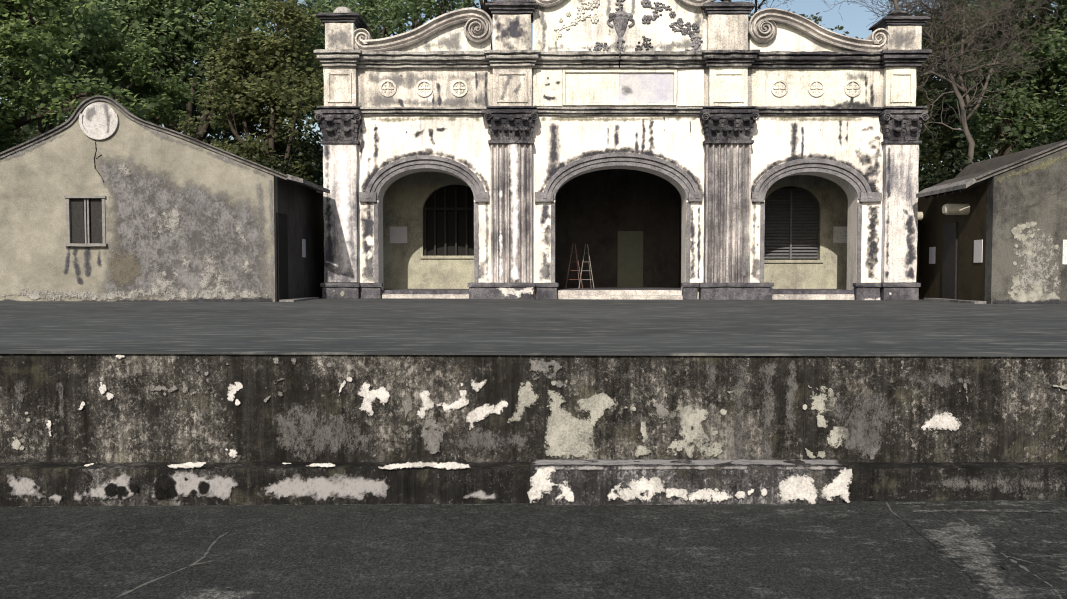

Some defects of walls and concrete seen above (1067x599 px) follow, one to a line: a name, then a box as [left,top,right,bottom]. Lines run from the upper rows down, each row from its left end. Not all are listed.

water stain [359,70,488,107]
water stain [360,120,489,281]
water stain [728,74,891,279]
water stain [904,210,916,279]
water stain [272,405,372,459]
peeling [339,377,390,416]
peeling [379,358,651,503]
peeling [653,403,727,458]
water stain [619,360,798,470]
peeling [803,386,882,460]
peeling [921,411,962,431]
peeling [607,468,853,504]